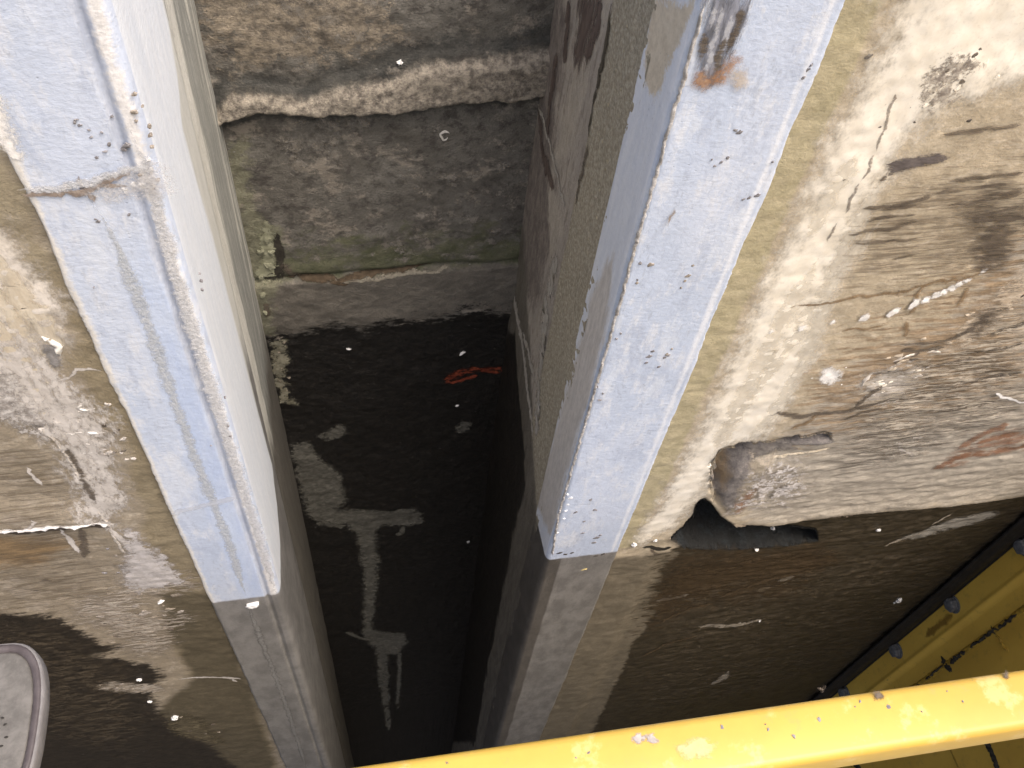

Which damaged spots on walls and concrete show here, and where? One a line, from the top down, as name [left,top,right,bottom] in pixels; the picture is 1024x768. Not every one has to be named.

corrosion [694,0,752,91]
damp [0,229,70,392]
damp [634,0,1024,545]
crack [791,272,989,337]
crack [0,521,133,557]
damp [289,442,425,731]
spalling [671,431,833,552]
corrosion [935,423,1024,469]